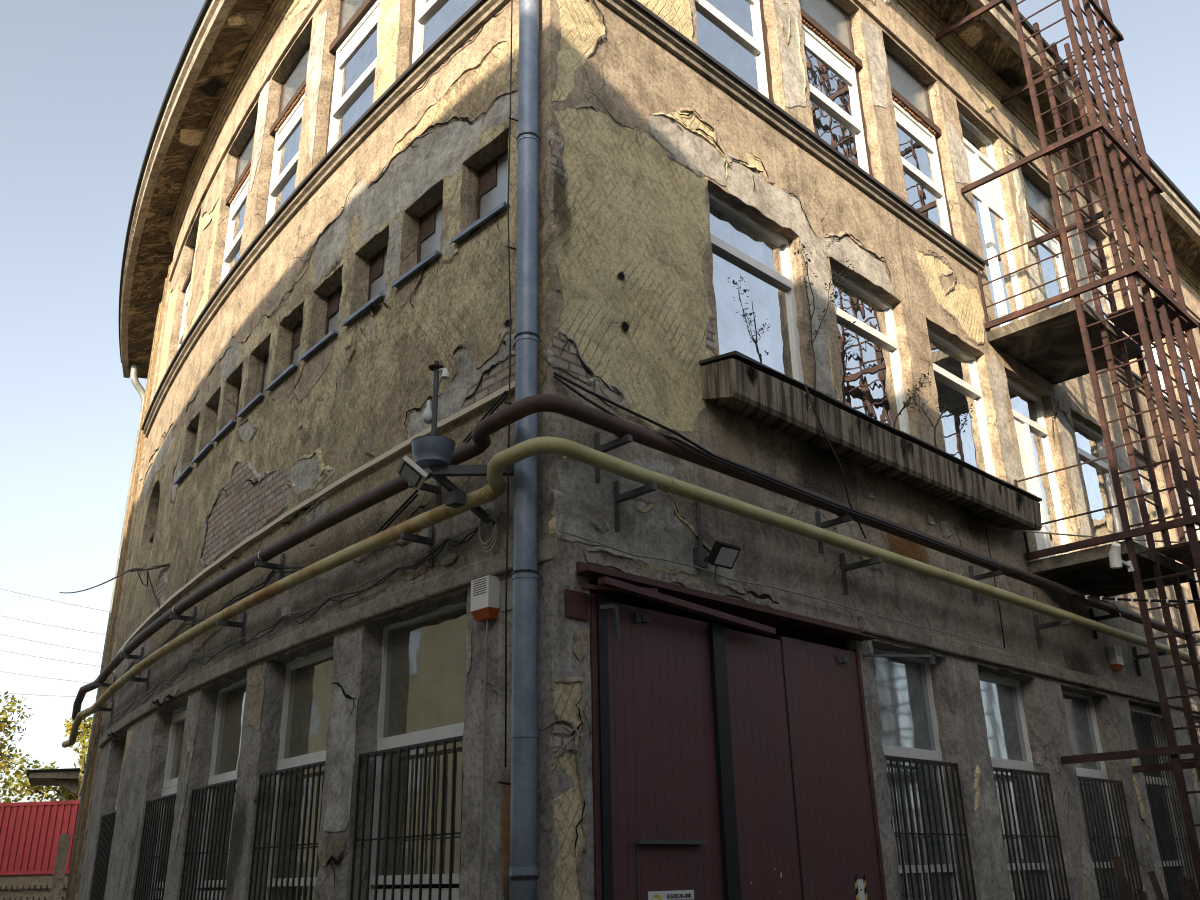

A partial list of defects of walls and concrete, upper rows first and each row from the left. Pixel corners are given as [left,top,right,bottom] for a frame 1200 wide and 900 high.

crack [252,100,500,330]
peeling [538,0,894,435]
peeling [115,36,519,658]
flaking render [547,456,772,607]
crack [325,851,343,885]
peeling [548,676,588,900]